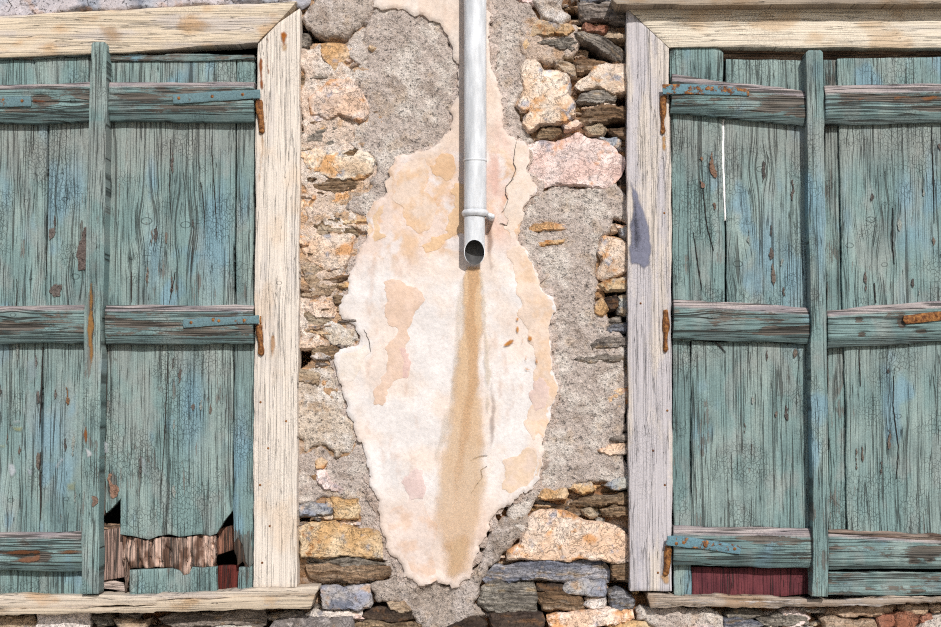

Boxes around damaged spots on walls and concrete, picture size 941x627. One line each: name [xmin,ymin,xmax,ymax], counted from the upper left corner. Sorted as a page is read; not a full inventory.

water stain [442,267,484,519]
peeling [299,0,628,627]